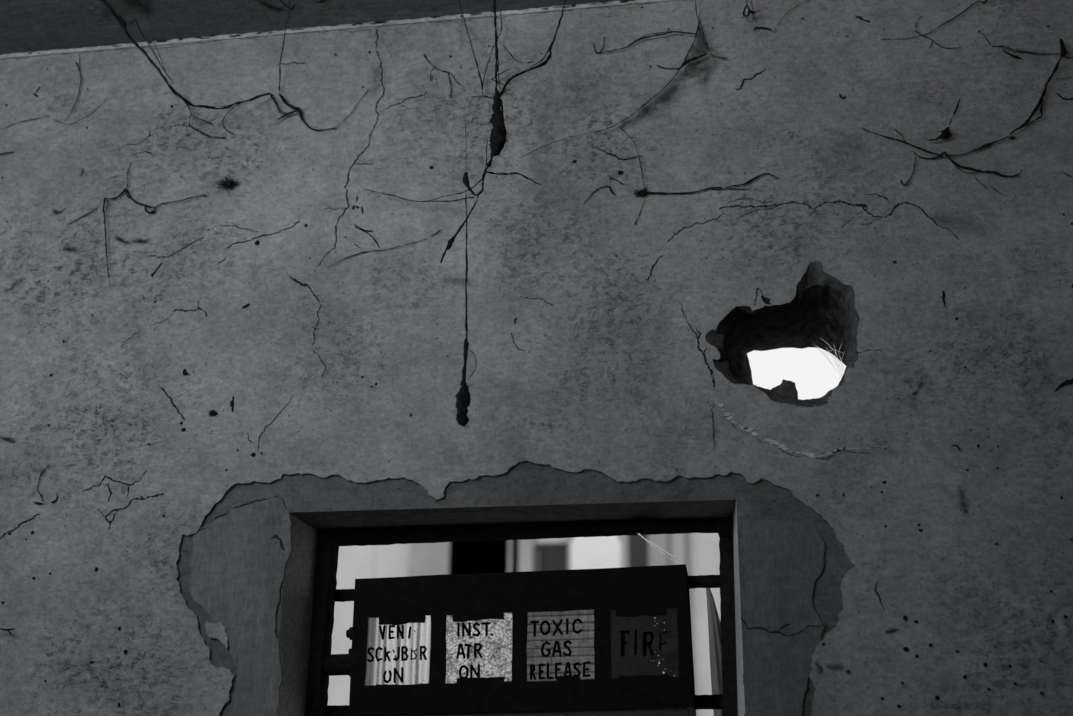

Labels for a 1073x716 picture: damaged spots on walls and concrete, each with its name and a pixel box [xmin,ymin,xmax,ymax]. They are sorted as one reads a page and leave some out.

crack [122,110,189,156]
crack [148,221,299,265]
crack [290,28,427,376]
crack [736,69,765,90]
hole [705,261,860,407]
spalling [177,462,855,716]